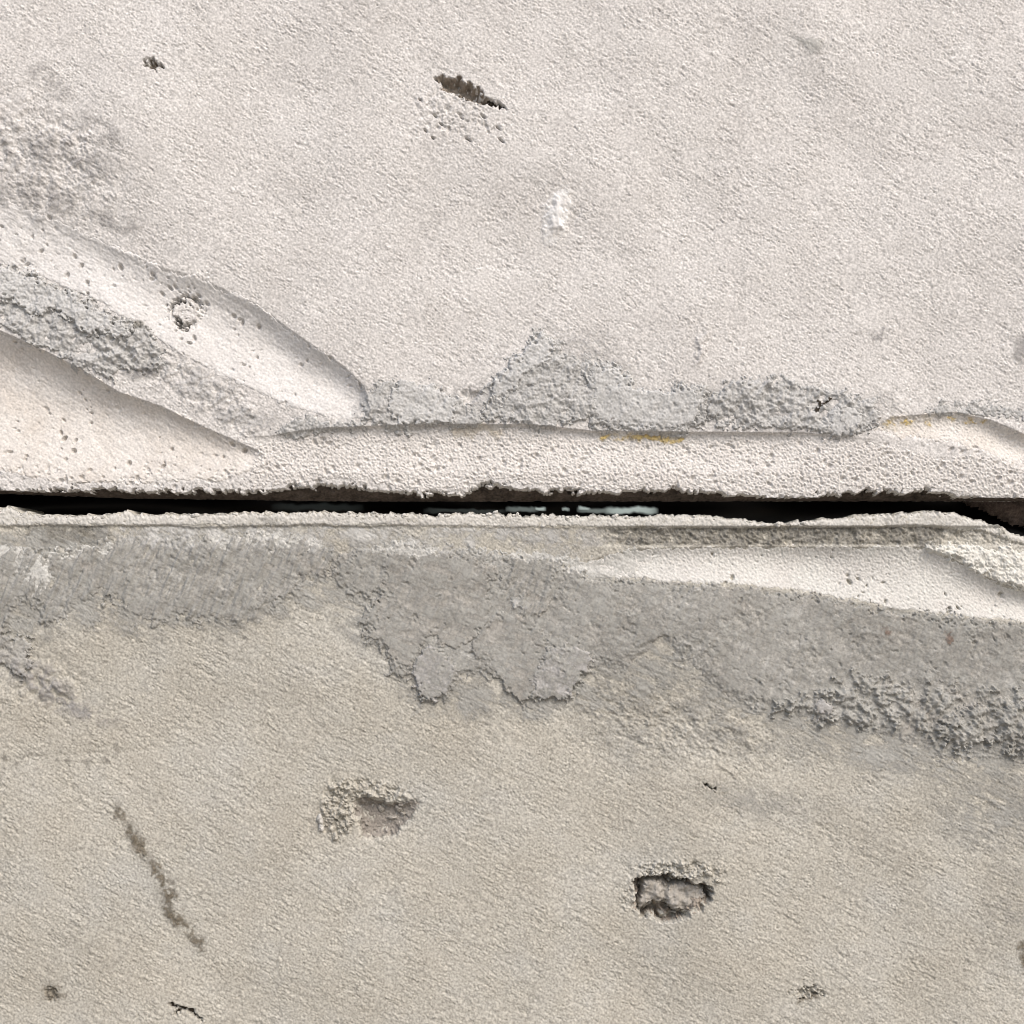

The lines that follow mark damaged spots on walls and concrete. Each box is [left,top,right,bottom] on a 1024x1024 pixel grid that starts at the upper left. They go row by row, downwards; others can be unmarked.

spalling [436,74,504,110]
peeling [490,331,557,408]
spalling [250,362,1024,502]
crack [0,494,1024,536]
spalling [0,506,1024,591]
peeling [0,624,35,682]
peeling [367,552,561,704]
peeling [529,642,595,703]
peeling [813,698,835,723]
spalling [316,790,419,841]
spalling [630,865,721,921]